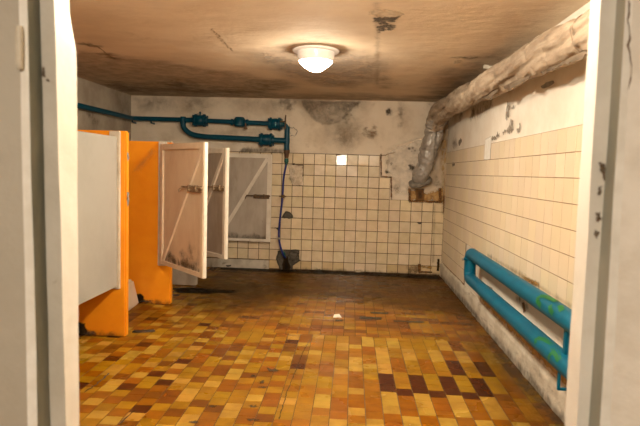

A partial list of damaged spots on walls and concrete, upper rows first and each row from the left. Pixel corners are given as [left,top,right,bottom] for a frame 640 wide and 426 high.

leakage [373,10,402,33]
crack [625,1,633,89]
leakage [266,52,370,84]
peeling [492,101,520,140]
rust [408,187,445,213]
leakage [482,299,567,386]